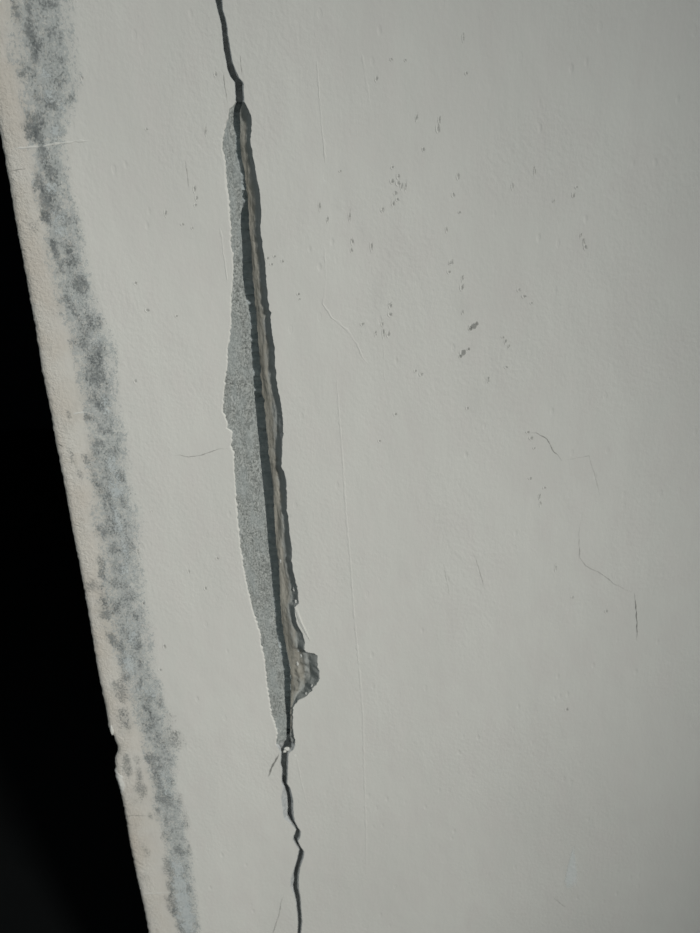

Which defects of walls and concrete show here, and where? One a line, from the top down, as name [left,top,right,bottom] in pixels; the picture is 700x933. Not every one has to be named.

spalling [220,102,287,746]
crack [215,0,320,933]